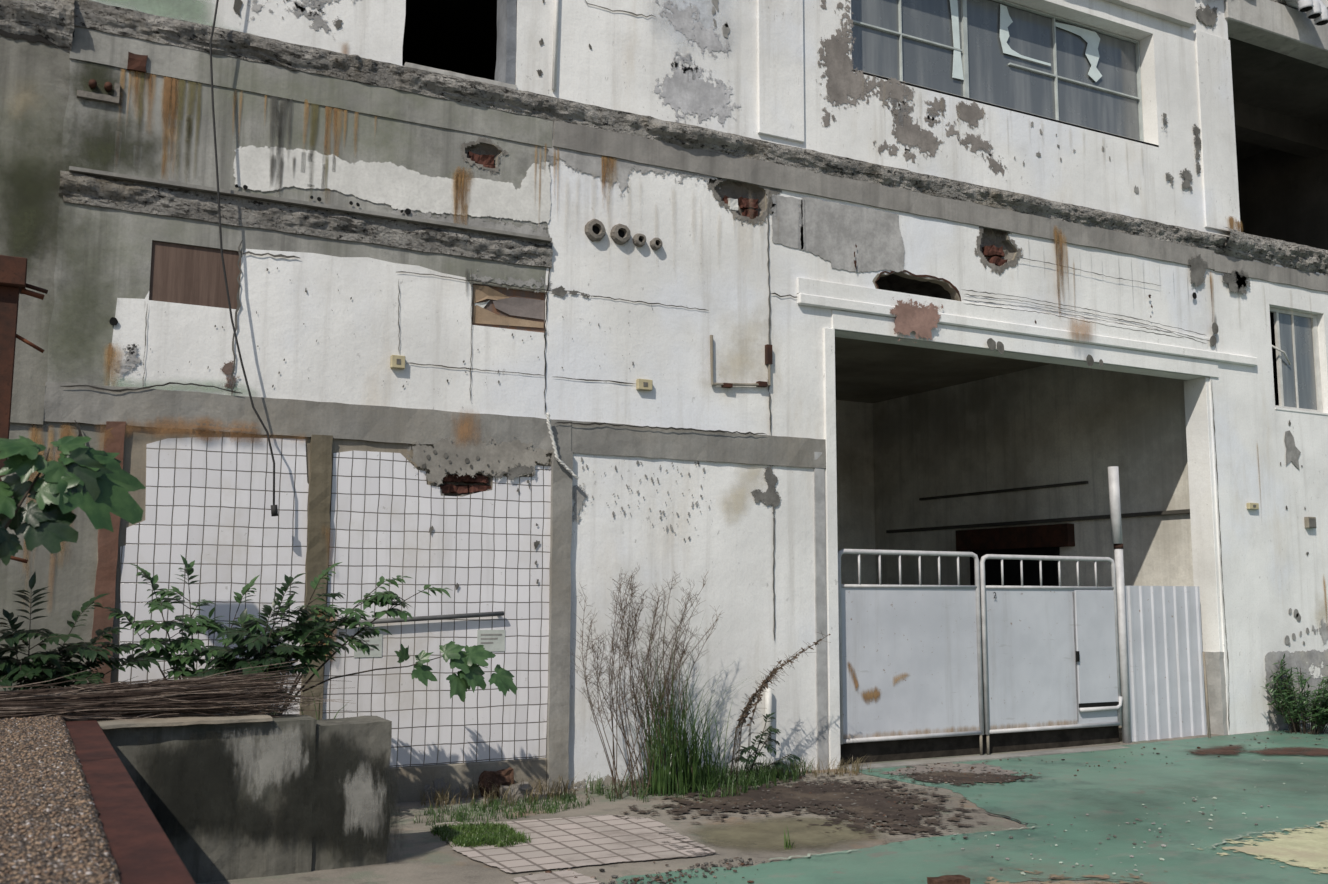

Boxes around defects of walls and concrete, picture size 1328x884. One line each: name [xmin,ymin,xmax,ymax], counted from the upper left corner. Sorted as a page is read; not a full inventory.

peeling [233,0,355,40]
rust [121,68,179,168]
rust [305,100,357,157]
peeling [816,0,1041,175]
peeling [1166,124,1201,192]
peeling [233,136,961,343]
spalling [974,226,1023,275]
rust [1054,229,1068,297]
peeling [405,435,553,497]
spalling [750,465,781,514]
rust [848,663,880,701]
peeling [1191,608,1328,756]